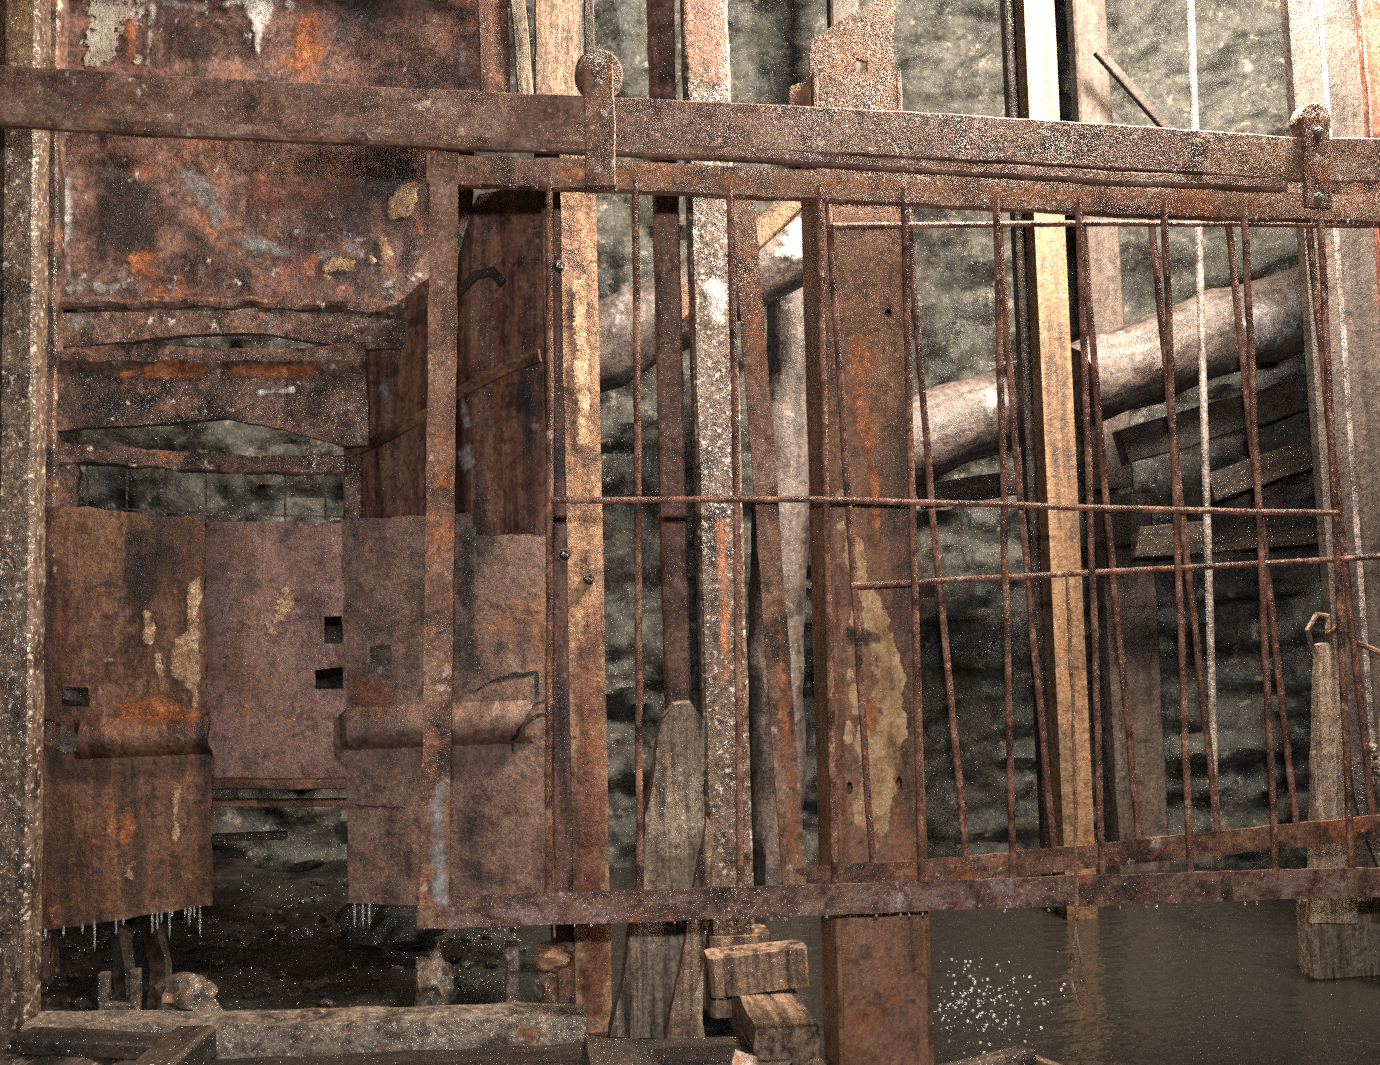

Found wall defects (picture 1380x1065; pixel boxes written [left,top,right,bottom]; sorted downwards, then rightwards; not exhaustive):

damp [149,0,294,65]
rust [1357,0,1380,133]
rust [722,172,1203,204]
rust [847,333,881,540]
rust [715,521,731,683]
rust [119,693,199,724]
rust [577,636,605,891]
rust [833,587,850,863]
rust [91,810,136,846]
rust [122,861,136,880]
rust [170,782,181,860]
rust [565,904,608,1016]